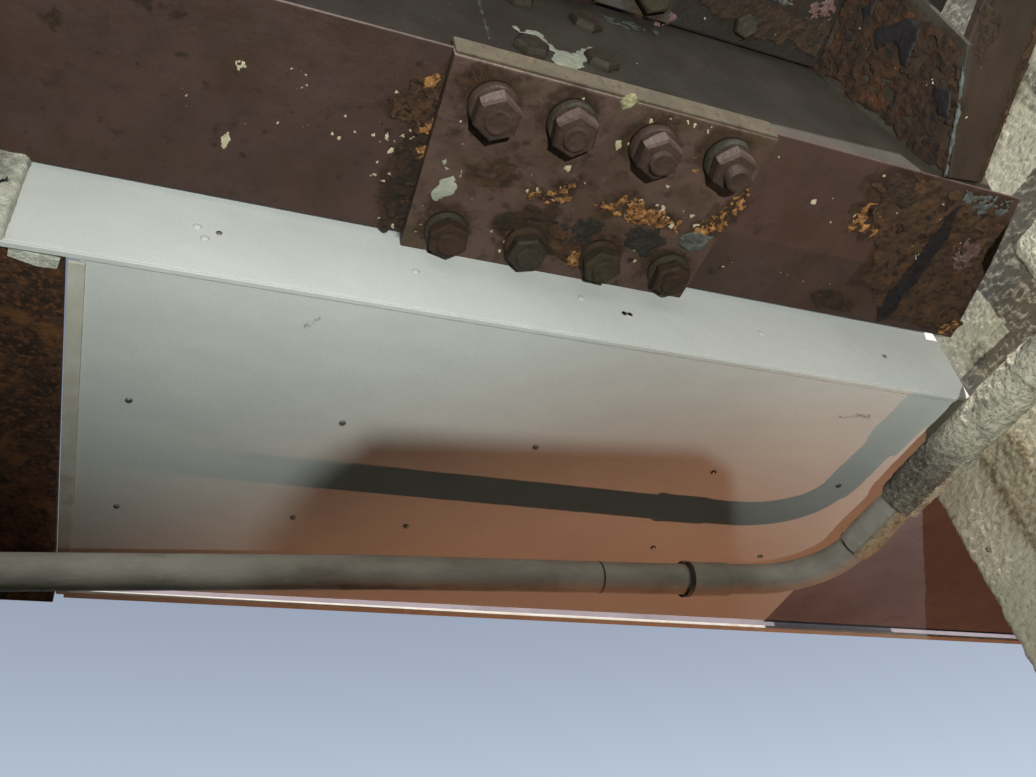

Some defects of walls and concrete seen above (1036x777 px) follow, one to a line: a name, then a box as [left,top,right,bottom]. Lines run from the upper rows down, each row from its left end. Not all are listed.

peeling [513,26,593,70]
peeling [809,0,837,25]
rust [370,68,445,234]
rust [490,165,586,268]
rust [593,188,750,236]
rust [810,0,1014,335]